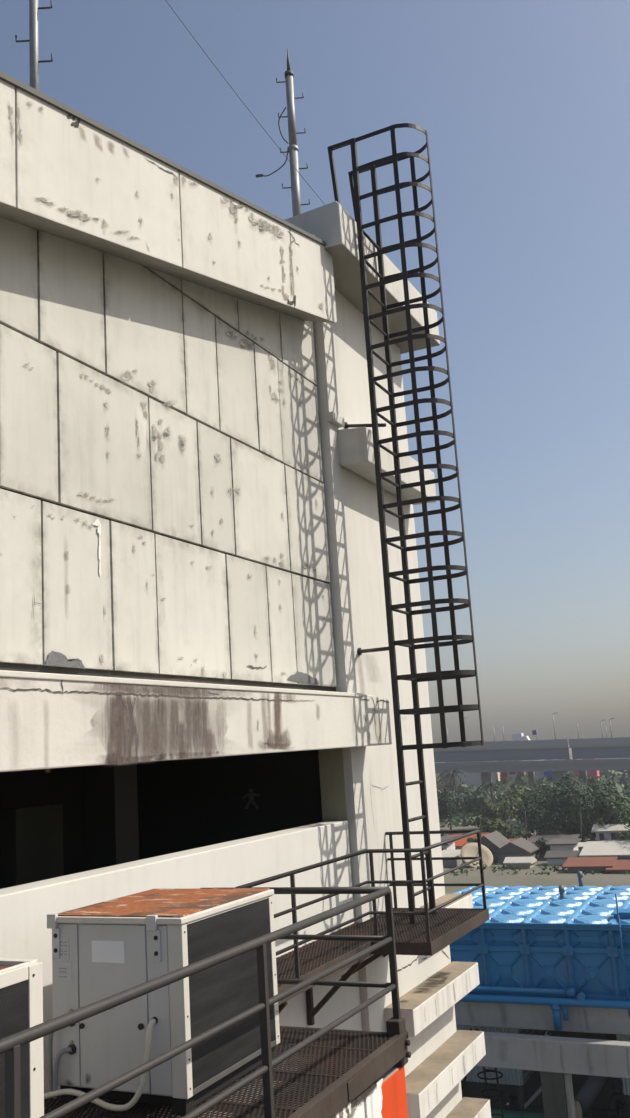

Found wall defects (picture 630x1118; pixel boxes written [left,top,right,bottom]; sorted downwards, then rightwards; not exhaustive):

peeling [35,197,142,239]
spalling [45,651,85,669]
spalling [282,671,320,684]
crack [0,680,312,702]
rust [270,692,289,748]